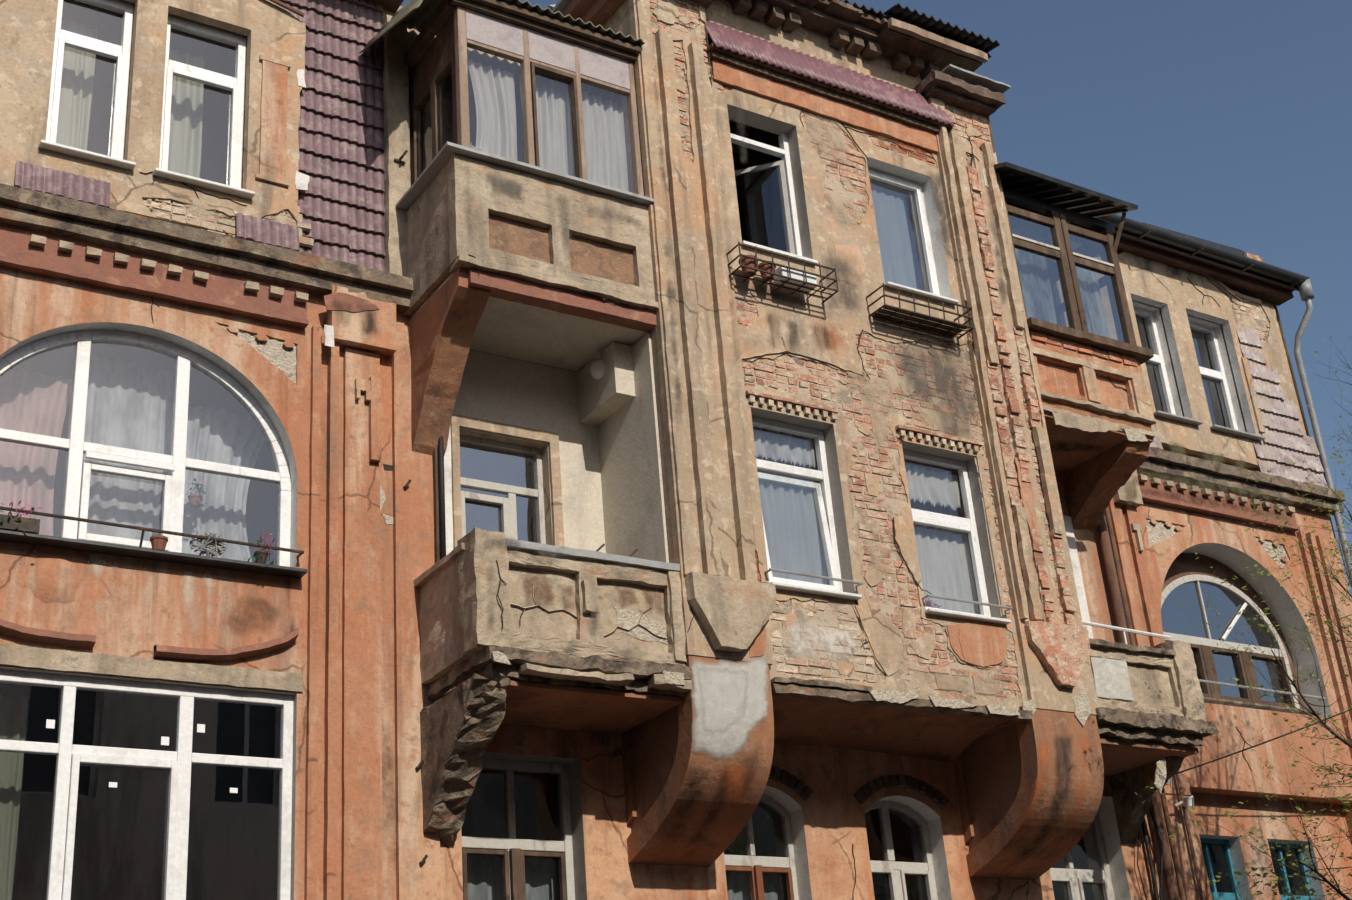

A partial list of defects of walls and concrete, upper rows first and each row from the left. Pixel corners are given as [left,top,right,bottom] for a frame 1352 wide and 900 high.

peeling [296,69,306,88]
spalling [649,0,734,161]
peeling [295,171,309,191]
spalling [801,110,937,226]
spalling [944,104,1003,222]
spalling [143,197,252,241]
spalling [262,206,314,248]
spalling [218,324,297,384]
spalling [742,302,1148,720]
crack [893,517,932,595]
crack [496,560,577,629]
crack [604,606,694,639]